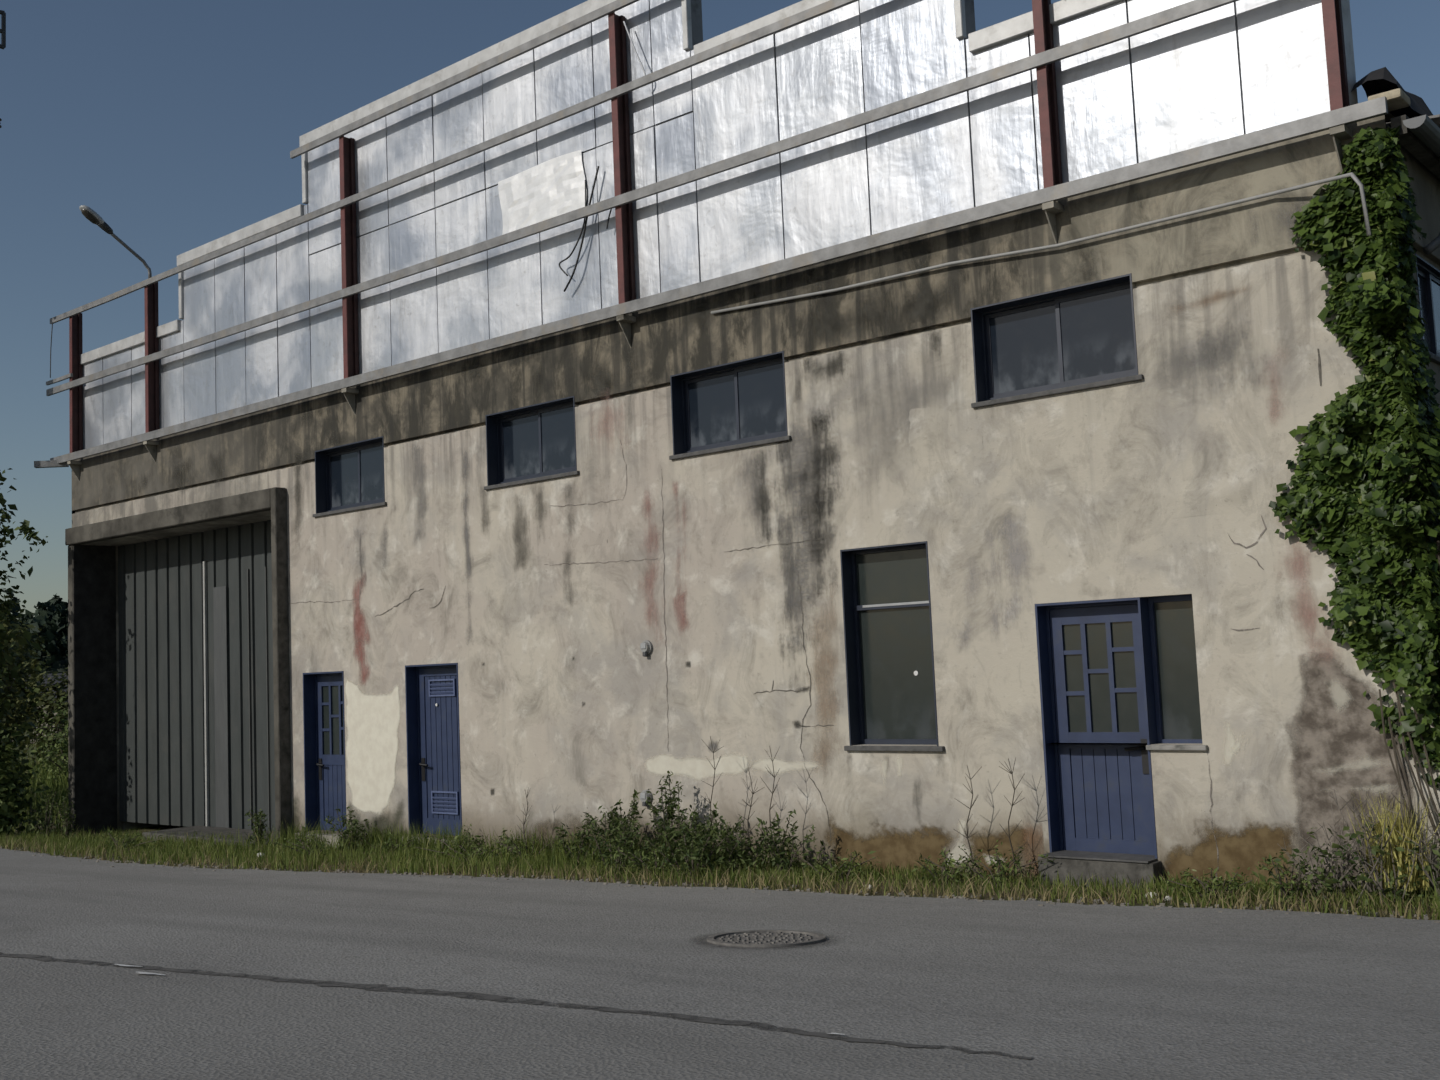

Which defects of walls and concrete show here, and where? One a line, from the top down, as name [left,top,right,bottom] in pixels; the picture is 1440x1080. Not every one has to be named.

leakage [815,354,842,375]
leakage [752,462,767,522]
leakage [783,419,825,610]
corrosion [354,581,369,682]
crack [729,538,833,841]
leakage [827,820,952,875]
leakage [971,826,1027,880]